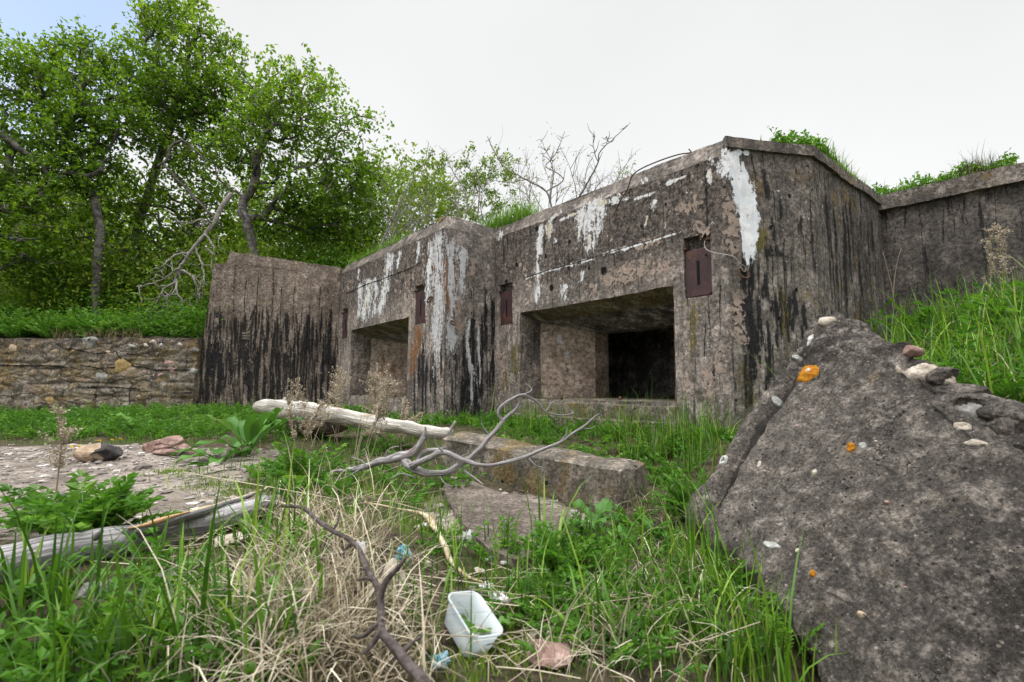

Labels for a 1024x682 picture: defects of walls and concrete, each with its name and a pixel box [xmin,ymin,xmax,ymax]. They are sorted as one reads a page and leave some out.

leakage [204,304,336,404]
leakage [356,250,402,323]
leakage [413,231,509,418]
peeling [588,224,677,296]
peeling [664,191,740,264]
leakage [706,148,808,410]
leakage [824,194,874,321]